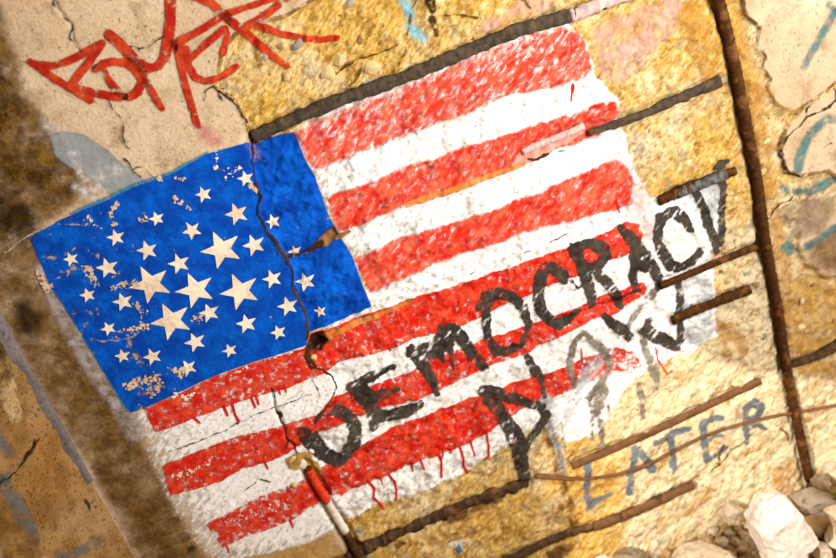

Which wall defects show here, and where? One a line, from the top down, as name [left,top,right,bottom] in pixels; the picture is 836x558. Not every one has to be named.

crack [53,0,82,53]
crack [108,99,154,177]
spalling [213,0,592,367]
crack [169,85,337,453]
spalling [339,0,836,558]
crack [0,438,40,485]
spalling [286,449,323,475]
corrosion [447,497,503,524]
corrosion [543,426,617,528]
corrosion [546,545,572,558]